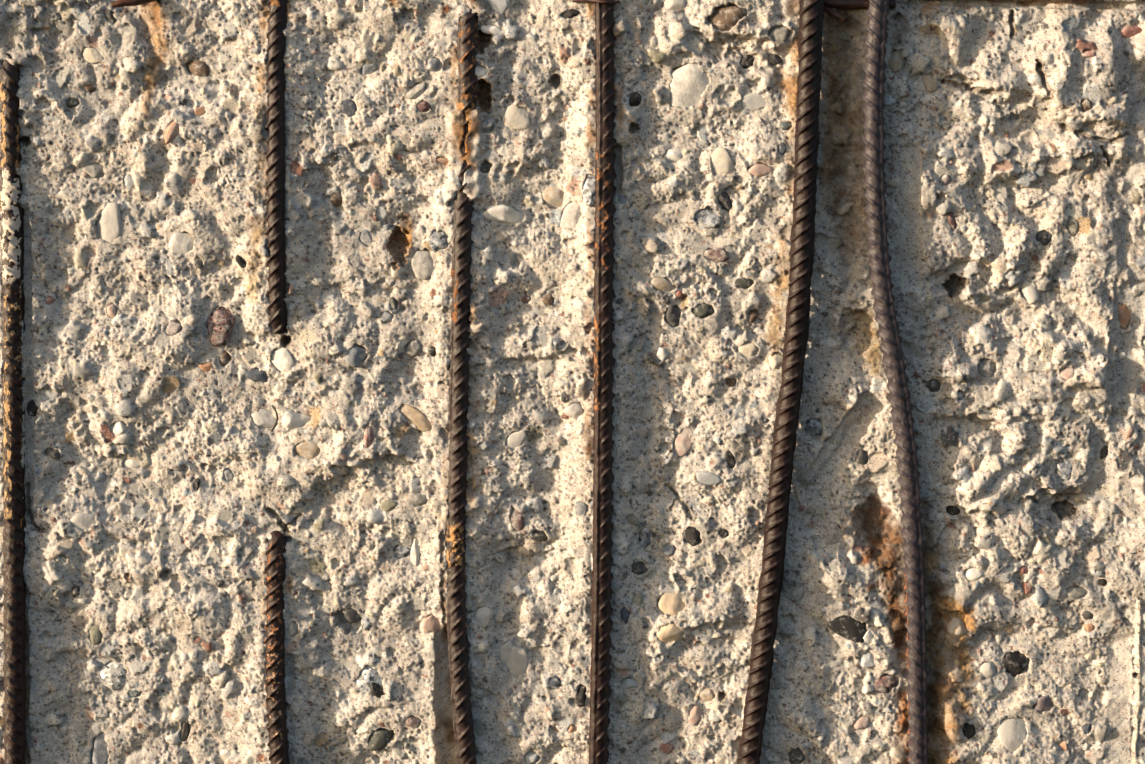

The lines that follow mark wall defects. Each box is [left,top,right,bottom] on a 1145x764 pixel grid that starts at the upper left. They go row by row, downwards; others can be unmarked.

spalling [0,53,31,764]
spalling [265,0,388,348]
corrosion [454,118,477,164]
spalling [446,2,494,764]
spalling [493,0,639,764]
corrosion [778,272,788,290]
corrosion [782,75,798,108]
spalling [661,0,1014,764]
spalling [235,531,292,764]
corrosion [862,496,907,659]
corrosion [898,692,909,728]
corrosion [926,584,975,764]